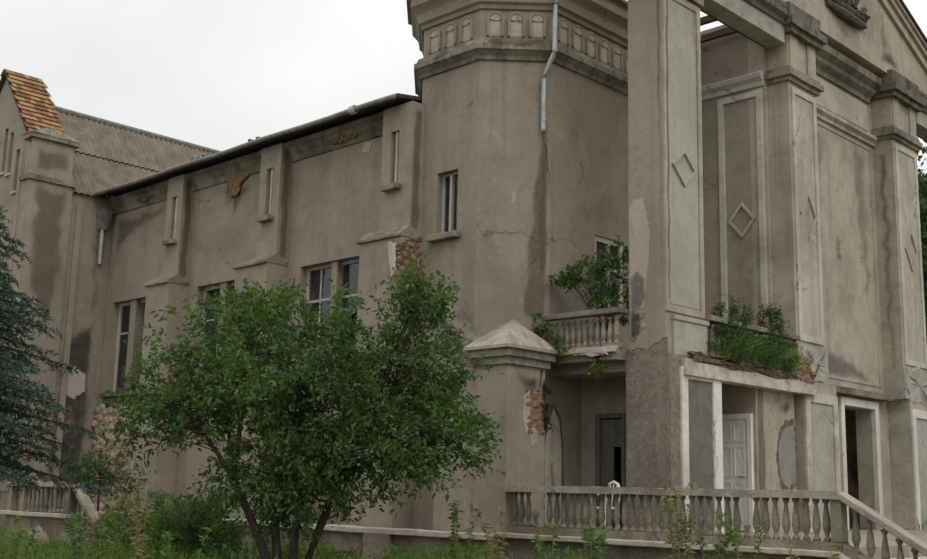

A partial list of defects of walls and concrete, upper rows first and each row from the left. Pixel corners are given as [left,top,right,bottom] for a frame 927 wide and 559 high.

flaking render [388,236,423,314]
water stain [68,331,90,374]
water stain [50,387,86,498]
flaking render [522,385,546,448]
peeling [776,419,796,490]